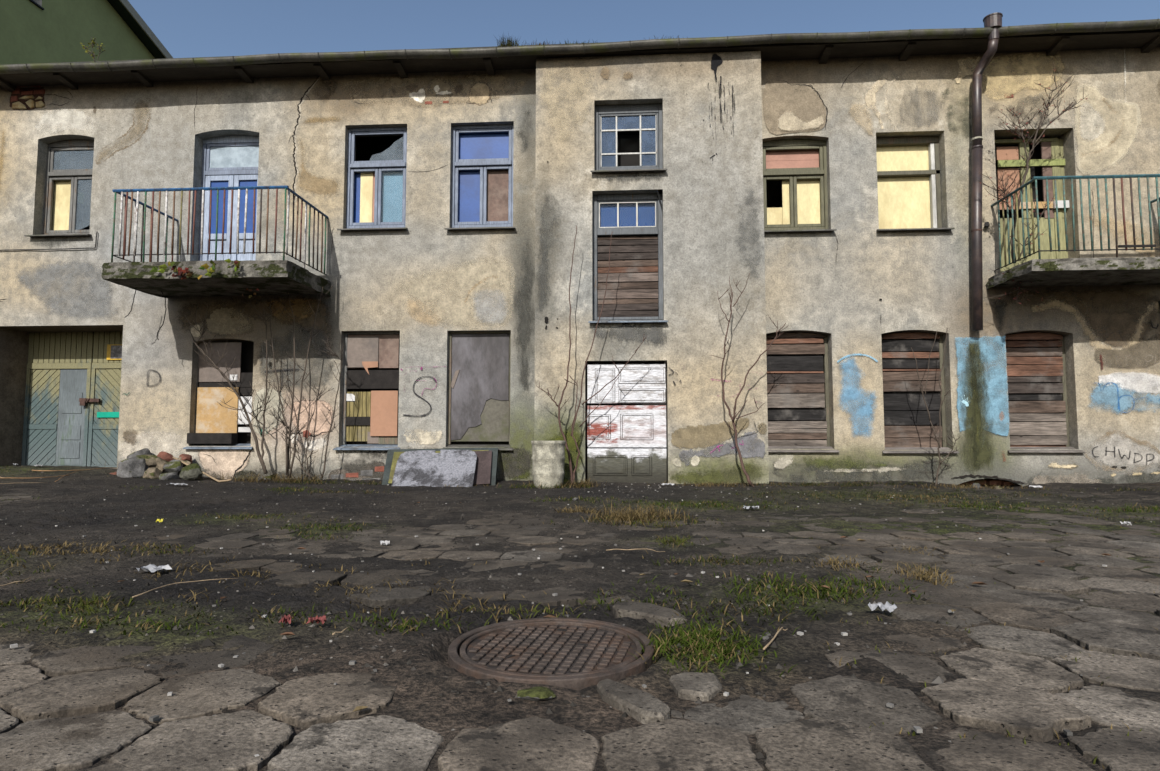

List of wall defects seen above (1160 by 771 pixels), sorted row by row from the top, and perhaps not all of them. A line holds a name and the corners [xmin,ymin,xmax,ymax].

peeling [347,73,525,107]
water stain [708,74,735,134]
crack [289,76,321,203]